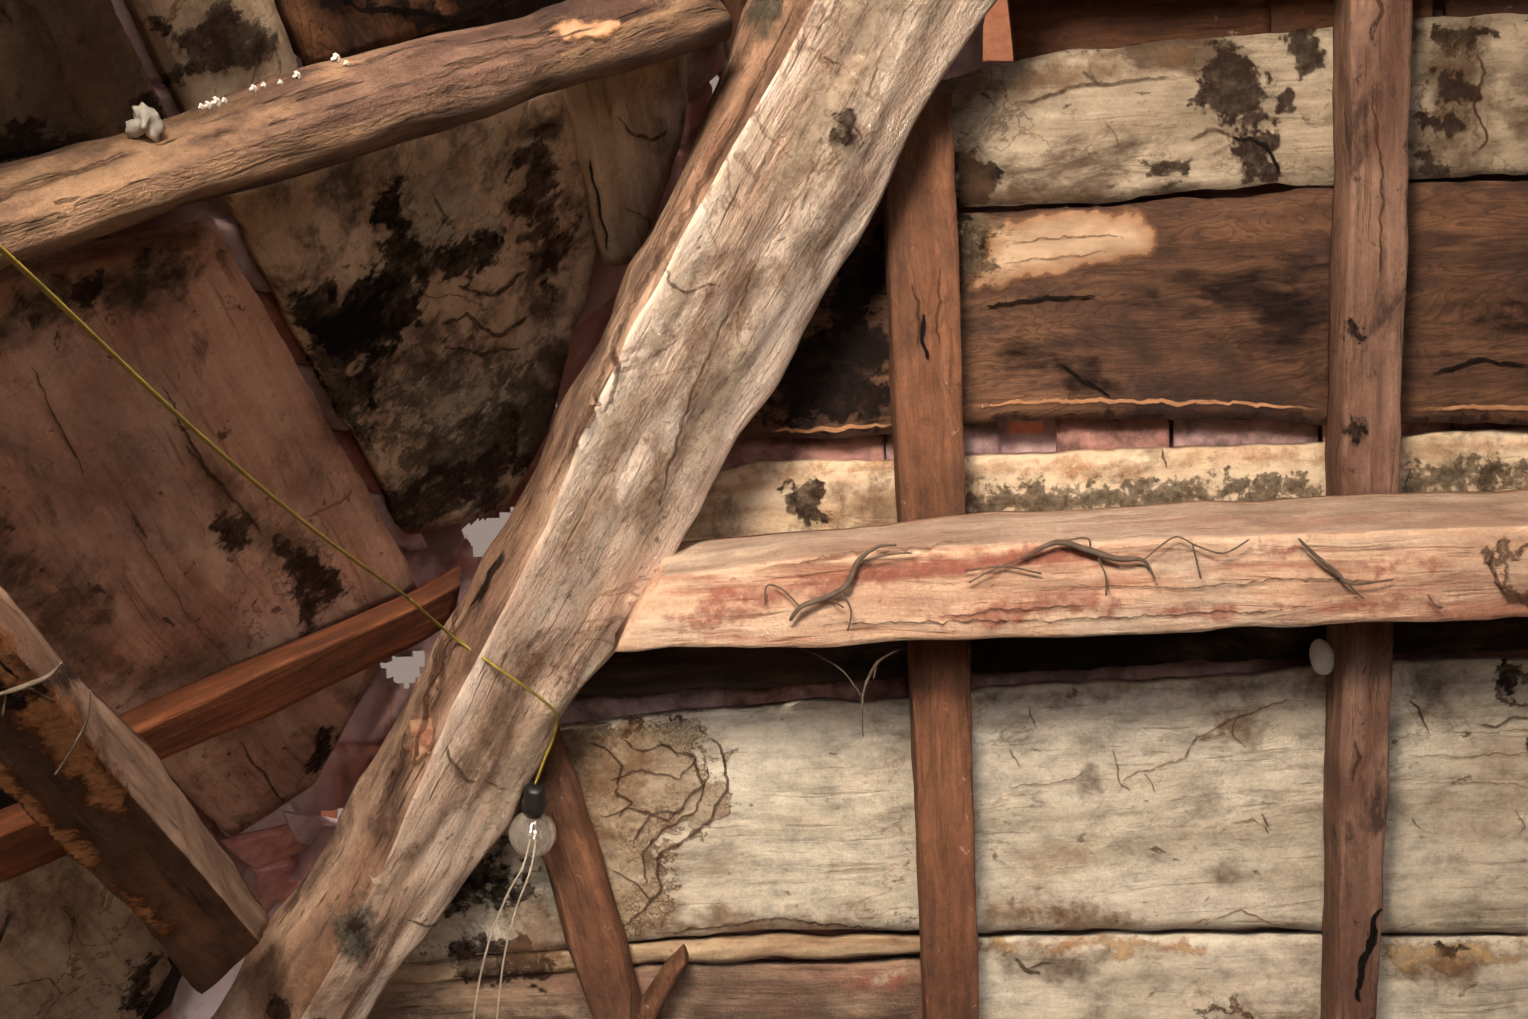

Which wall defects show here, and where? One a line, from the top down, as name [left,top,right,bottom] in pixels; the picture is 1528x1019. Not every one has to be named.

water stain [319,0,521,33]
water stain [1015,28,1327,184]
water stain [1408,23,1501,180]
water stain [954,138,1095,309]
water stain [282,122,583,533]
water stain [1005,347,1115,396]
water stain [1174,259,1329,361]
water stain [965,450,1323,514]
water stain [1400,451,1528,493]
crack [1409,701,1528,787]